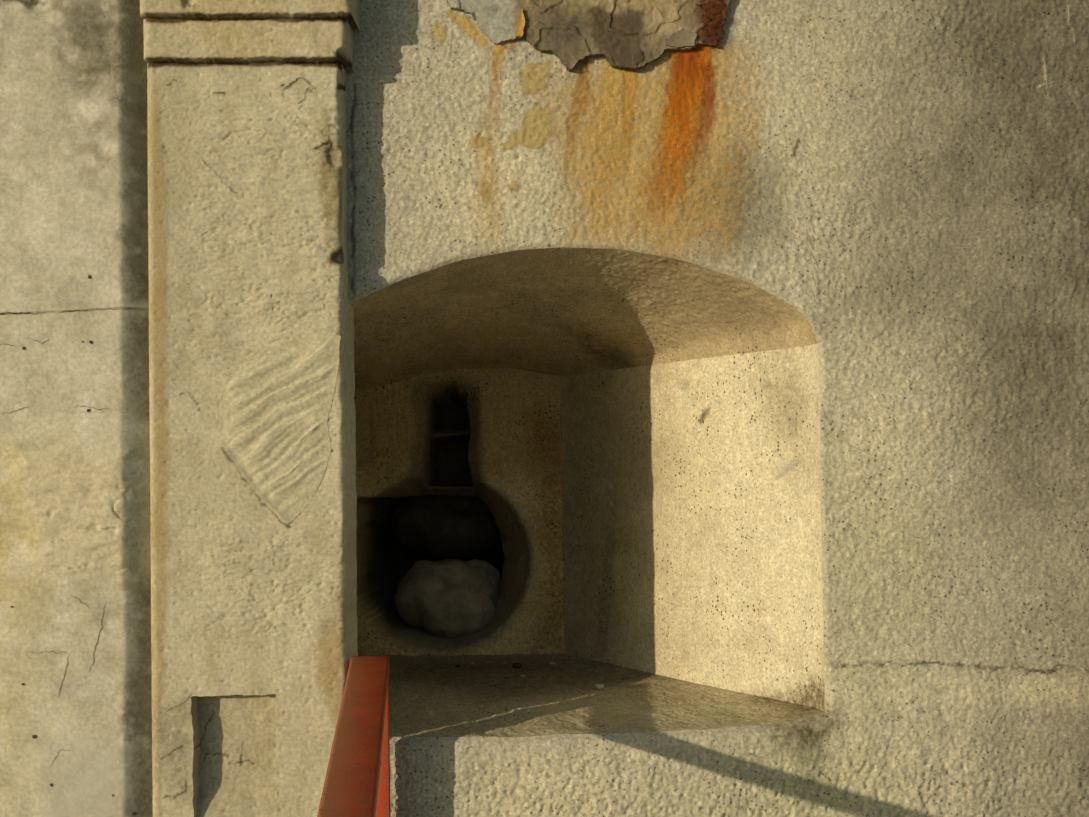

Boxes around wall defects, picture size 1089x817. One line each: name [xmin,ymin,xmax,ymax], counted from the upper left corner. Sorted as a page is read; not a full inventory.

peeling [446,0,730,149]
rust [549,0,756,254]
crack [222,448,290,528]